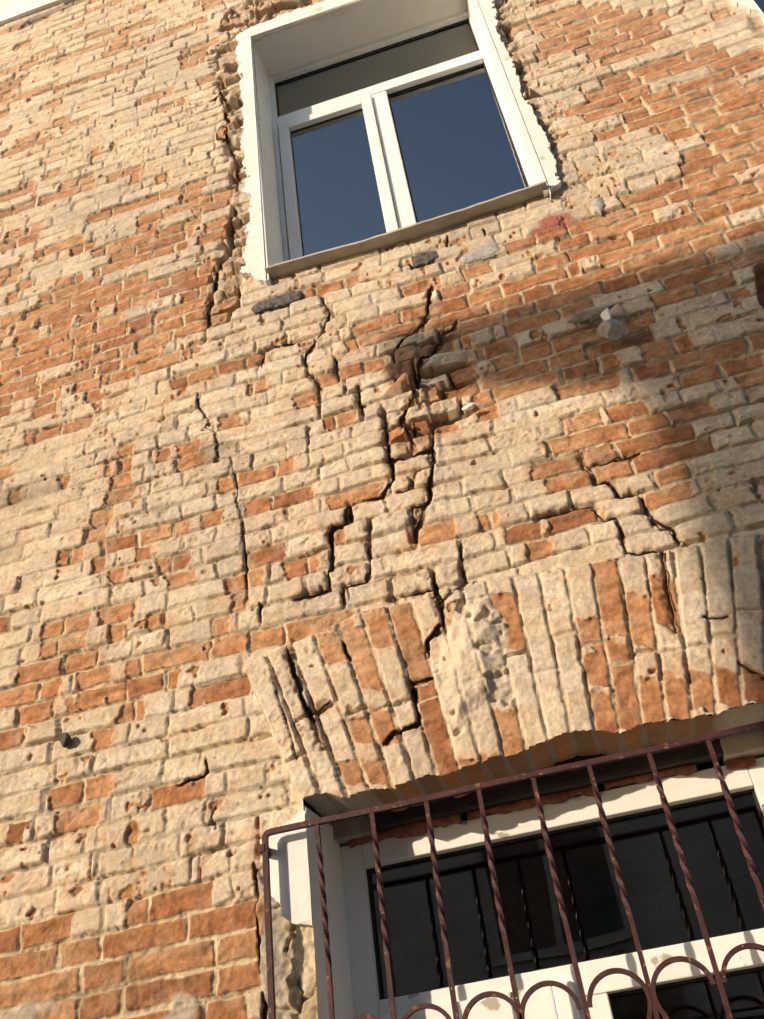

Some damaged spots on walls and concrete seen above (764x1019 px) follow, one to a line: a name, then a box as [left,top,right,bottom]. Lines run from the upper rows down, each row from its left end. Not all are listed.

crack [207,91,241,328]
flaking render [344,0,764,350]
crack [197,393,262,621]
crack [258,285,457,603]
flaking render [421,359,622,422]
crack [538,452,688,632]
flaking render [529,400,716,510]
flaking render [551,308,764,388]
crack [274,646,330,758]
crack [382,544,466,745]
peeling [349,763,698,849]
peeling [725,756,757,770]